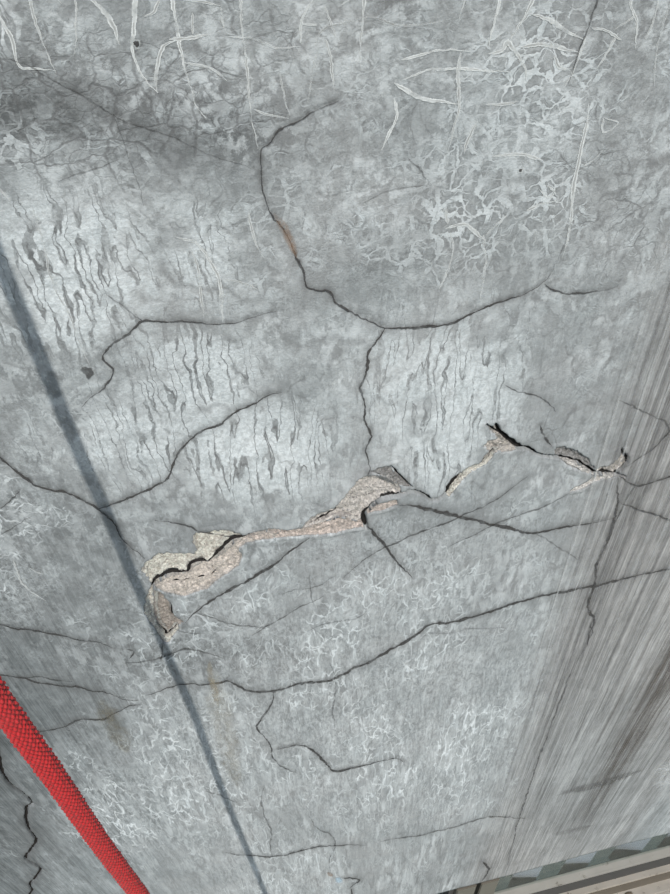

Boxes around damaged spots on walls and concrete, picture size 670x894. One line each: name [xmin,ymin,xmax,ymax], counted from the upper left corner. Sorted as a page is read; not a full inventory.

water stain [0,0,56,72]
water stain [130,0,227,118]
water stain [382,48,513,150]
water stain [488,0,585,87]
crack [260,101,618,474]
crack [85,311,276,403]
crack [0,392,282,559]
spalling [445,423,543,496]
spalling [554,446,627,491]
spalling [141,466,431,642]
crack [0,419,670,772]
crack [0,756,42,894]